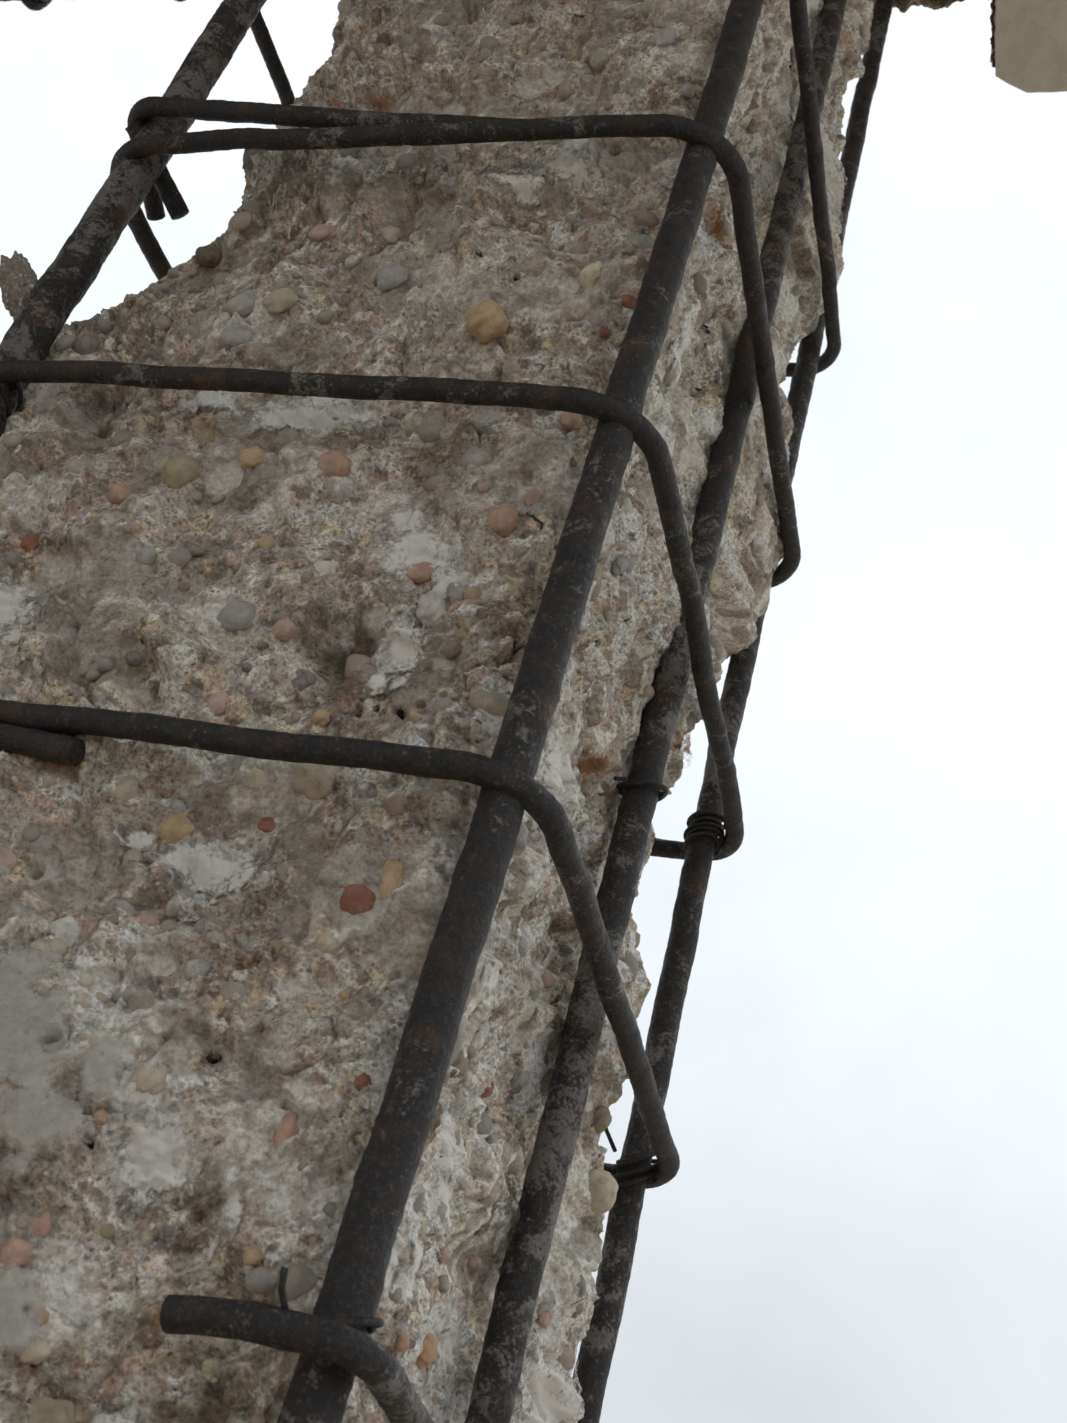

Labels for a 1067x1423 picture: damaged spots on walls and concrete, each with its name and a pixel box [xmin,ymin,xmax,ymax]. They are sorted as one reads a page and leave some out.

crack [987,0,996,68]
rust [709,198,726,248]
rust [579,747,616,778]
rust [669,730,691,754]